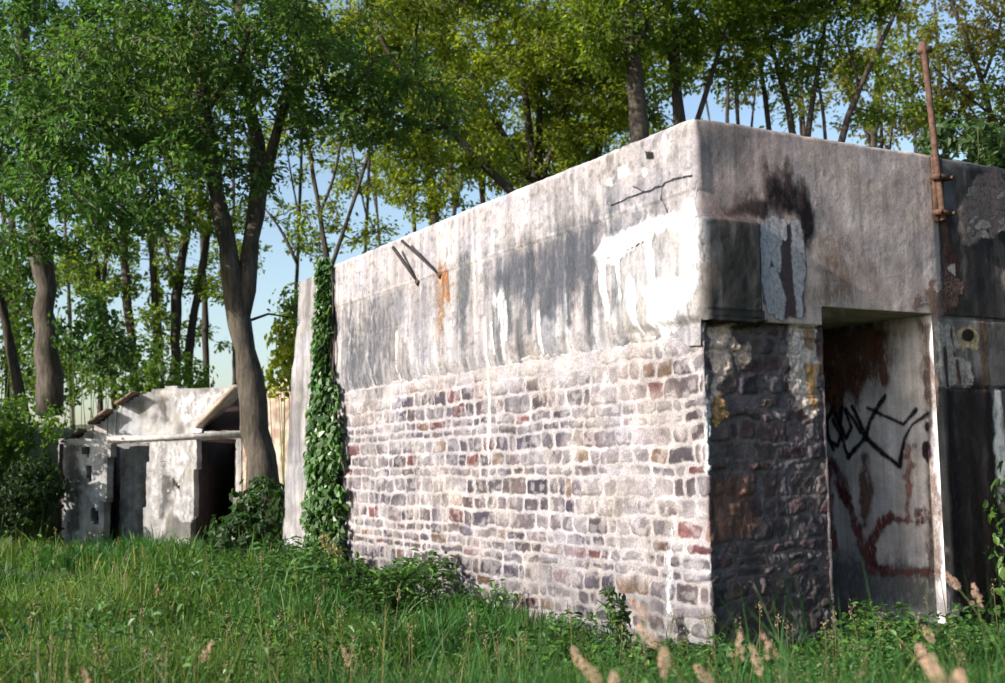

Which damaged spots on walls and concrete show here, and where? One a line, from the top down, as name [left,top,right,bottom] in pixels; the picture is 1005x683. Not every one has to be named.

crack [611,175,692,213]
water stain [716,158,815,246]
spalling [958,166,1005,246]
rust [438,266,450,333]
water stain [459,254,470,315]
water stain [483,200,700,457]
peeling [705,216,820,427]